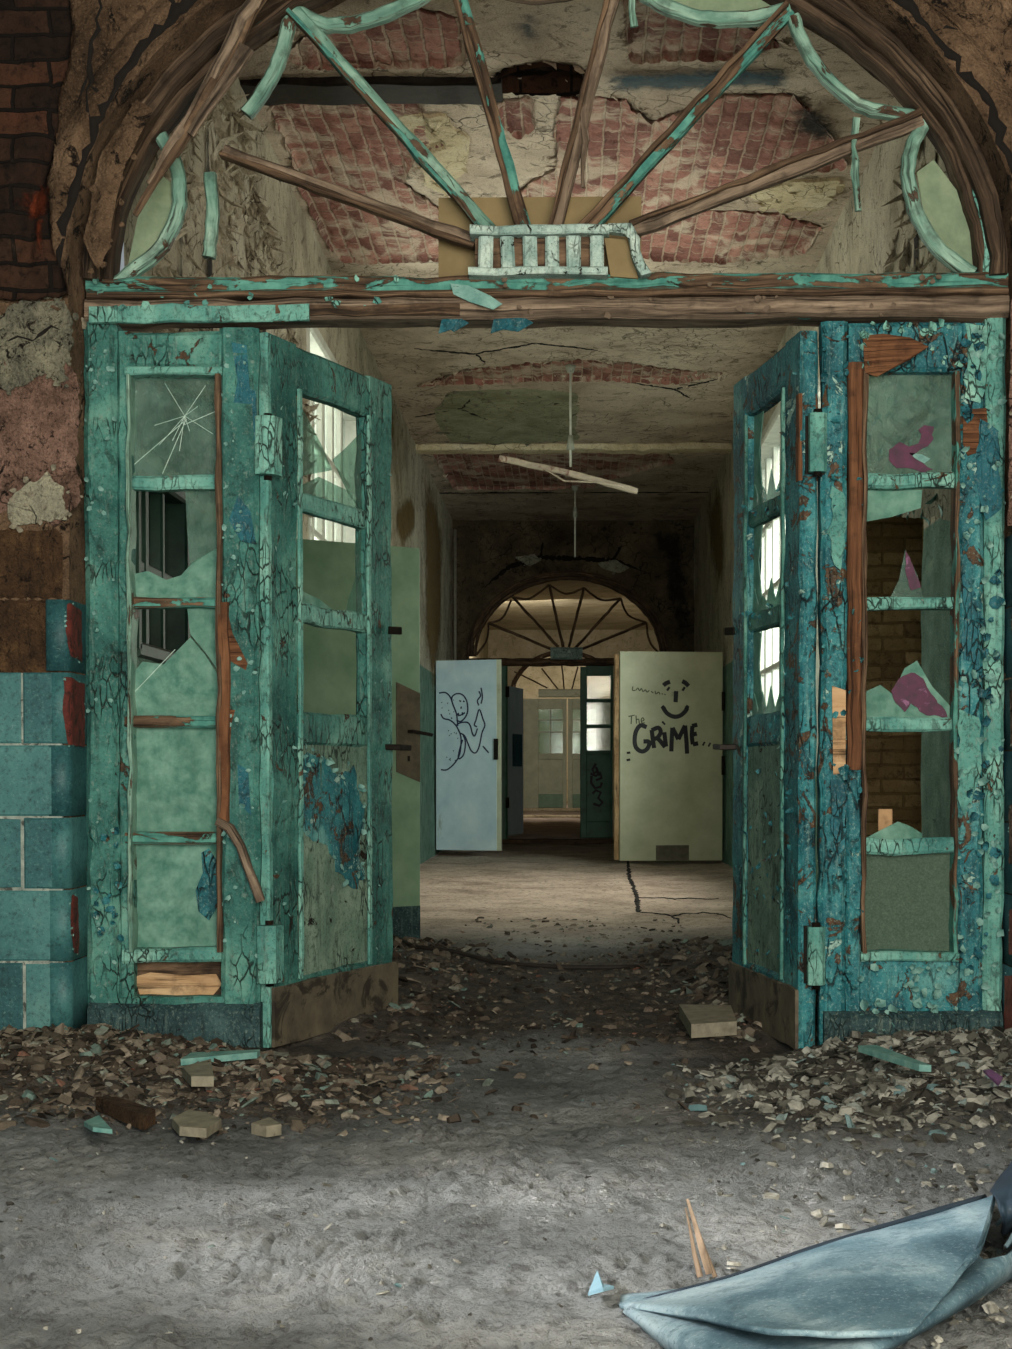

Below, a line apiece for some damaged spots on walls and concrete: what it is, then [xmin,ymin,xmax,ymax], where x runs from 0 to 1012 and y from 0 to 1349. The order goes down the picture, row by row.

crack [56,0,197,279]
flaking render [152,87,470,368]
flaking render [497,95,690,197]
flaking render [620,0,756,65]
flaking render [630,93,835,215]
crack [892,0,1012,174]
flaking render [0,0,115,747]
peeling [417,359,730,491]
peeling [821,300,1012,543]
crack [484,543,646,588]
peeling [820,569,1012,1032]
crack [626,861,730,924]